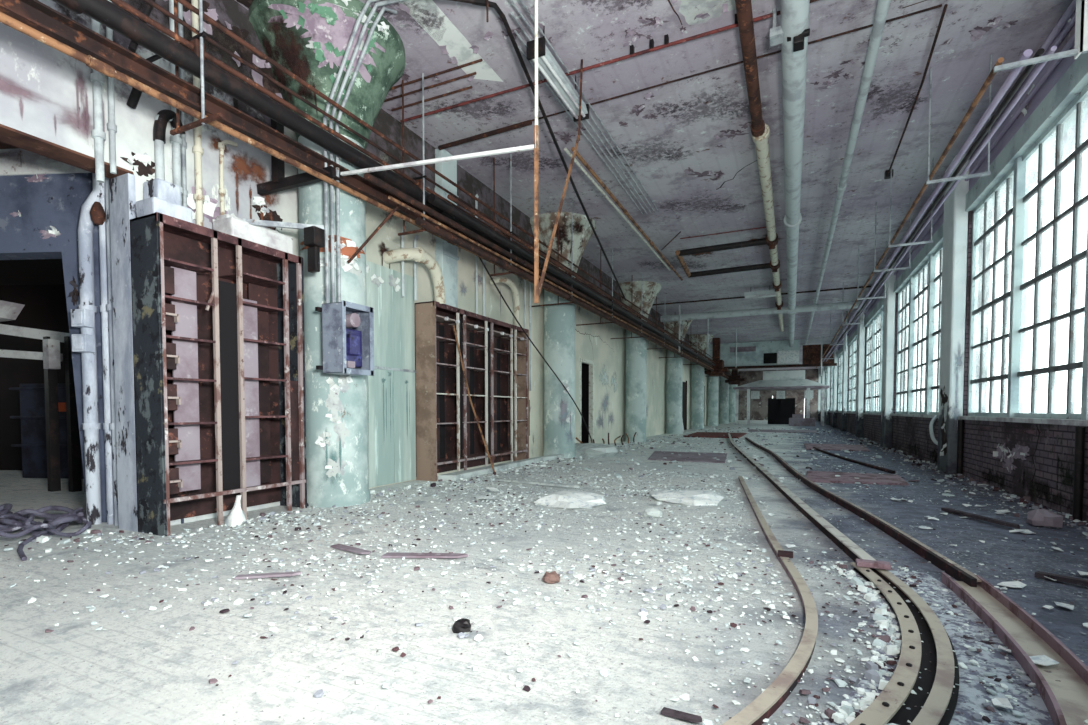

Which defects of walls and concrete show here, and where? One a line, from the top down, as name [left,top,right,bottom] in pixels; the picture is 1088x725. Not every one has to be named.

peeling [183,0,283,104]
peeling [268,0,389,99]
flaking render [398,0,527,82]
corrosion [211,137,277,230]
peeling [39,226,61,239]
peeling [68,277,79,306]